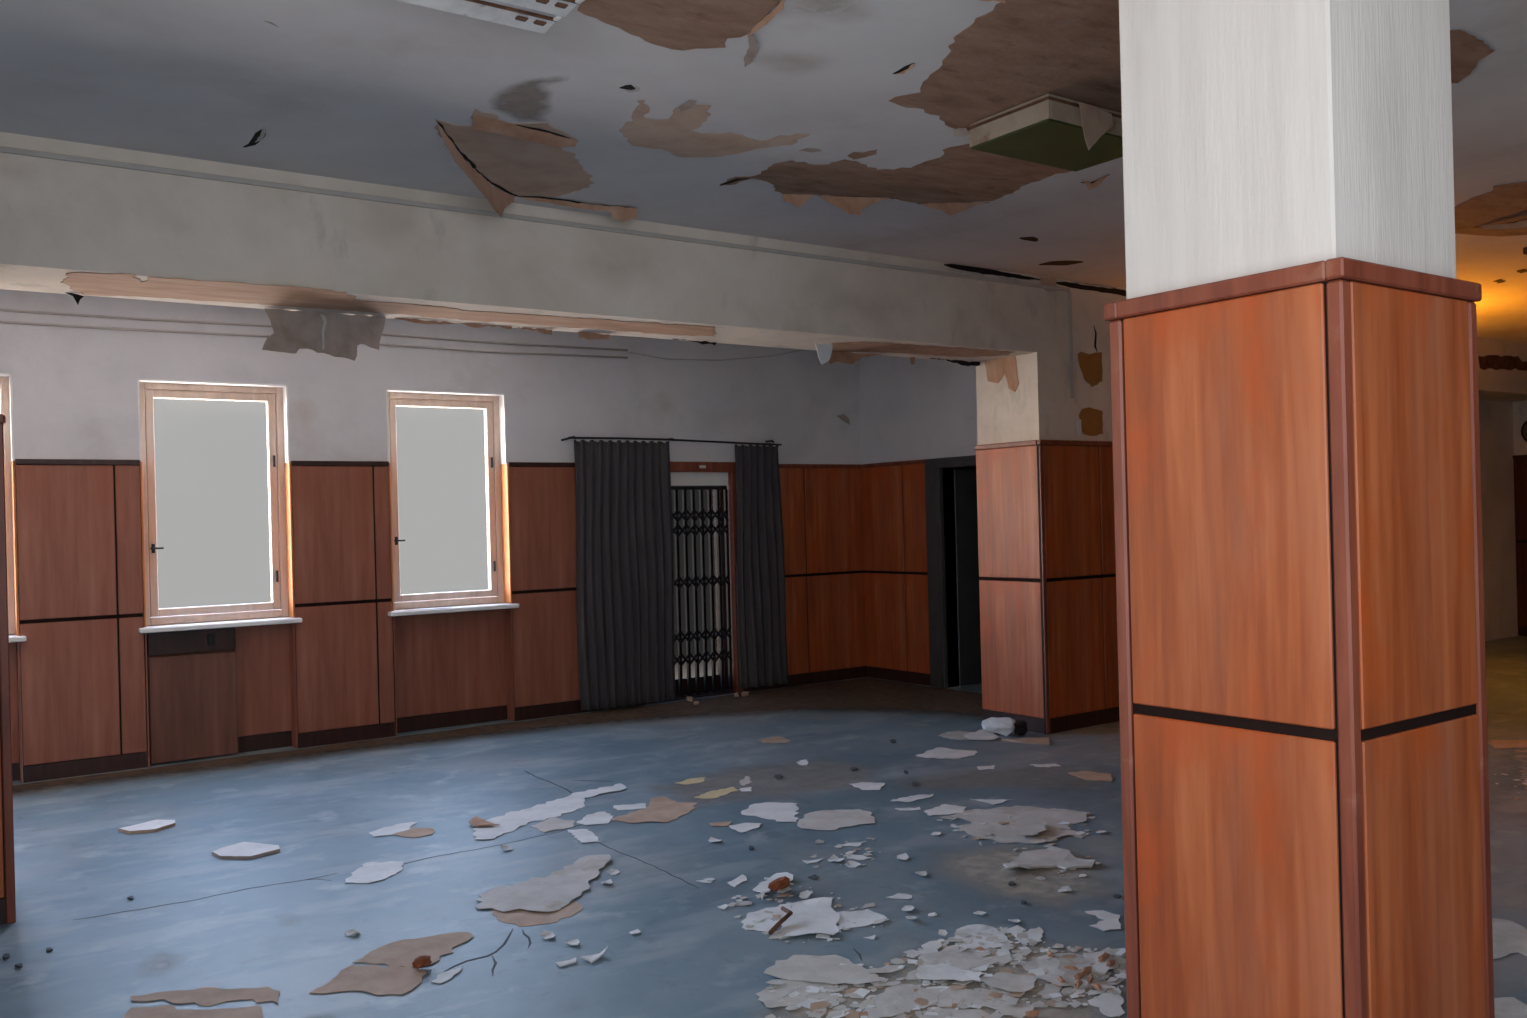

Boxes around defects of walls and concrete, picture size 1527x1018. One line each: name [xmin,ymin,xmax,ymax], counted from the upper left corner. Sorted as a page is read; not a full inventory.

peeling [577,0,785,68]
peeling [1450,30,1495,83]
damp [497,81,546,120]
peeling [619,0,1122,216]
peeling [1454,182,1527,237]
peeling [1078,352,1103,387]
peeling [1076,407,1103,436]